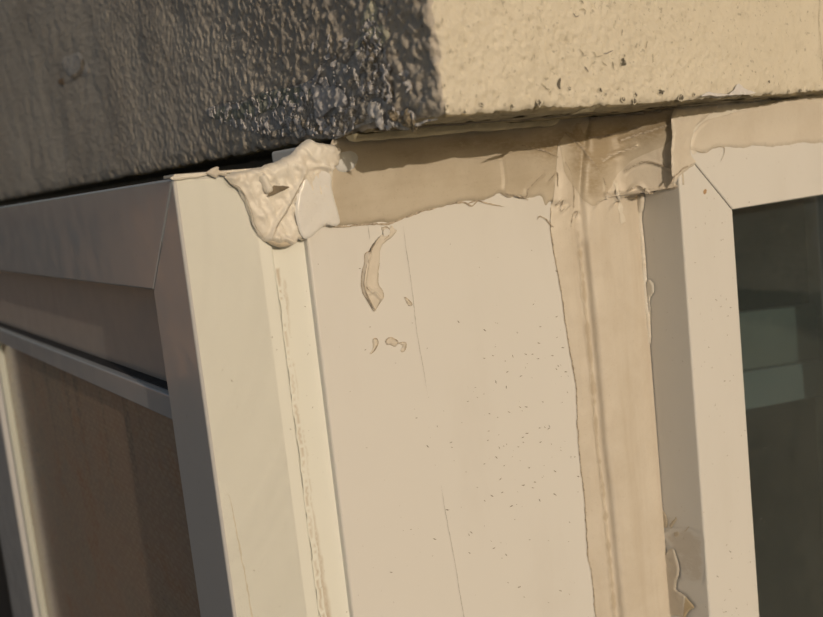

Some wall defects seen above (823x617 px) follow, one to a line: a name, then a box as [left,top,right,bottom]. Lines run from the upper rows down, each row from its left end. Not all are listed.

peeling [206,0,437,141]
water stain [373,88,809,206]